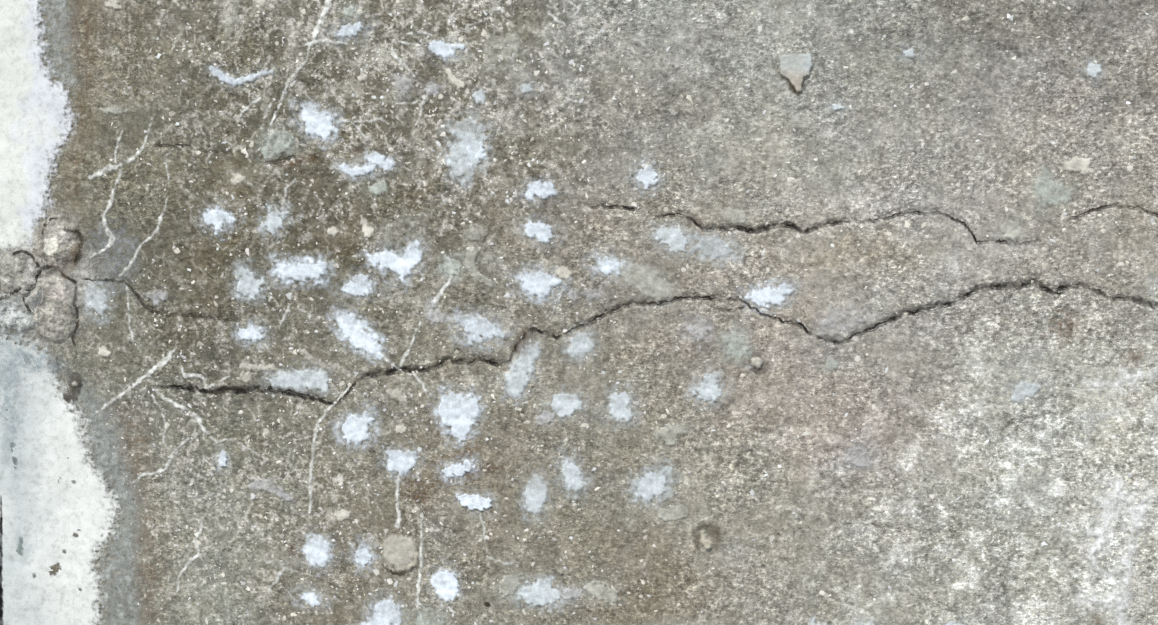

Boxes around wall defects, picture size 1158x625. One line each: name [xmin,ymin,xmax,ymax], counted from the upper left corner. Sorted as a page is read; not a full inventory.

crack [0,216,232,344]
crack [591,204,1040,245]
crack [1070,204,1158,218]
crack [161,282,1158,405]